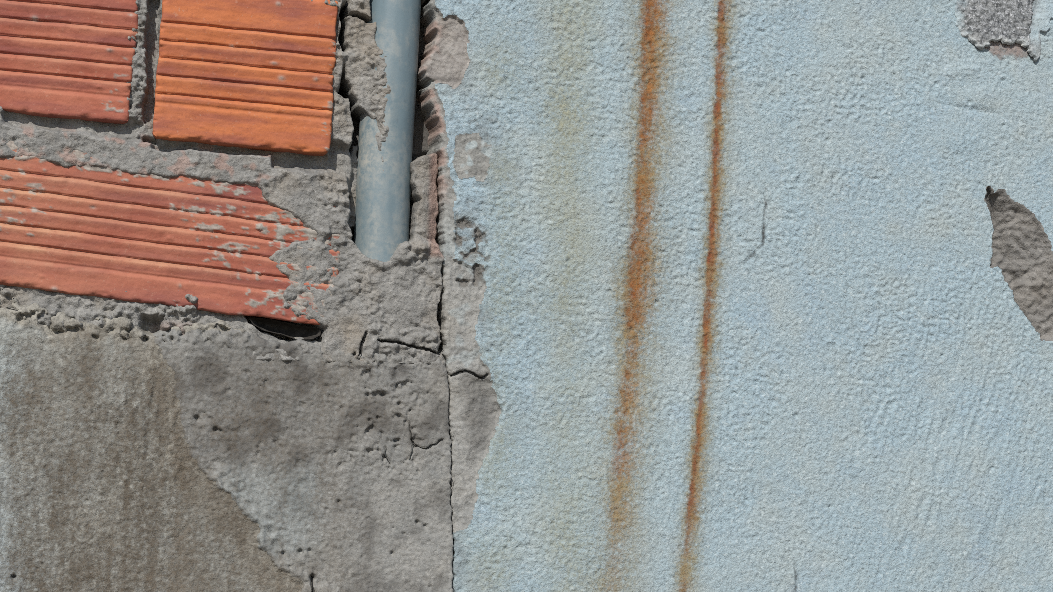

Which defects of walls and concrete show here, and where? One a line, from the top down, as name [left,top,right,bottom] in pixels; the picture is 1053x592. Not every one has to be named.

peeling [954,0,1053,62]
crack [354,331,488,378]
flaking render [416,0,501,533]
rust [610,0,667,443]
rust [680,0,730,592]
spalling [984,186,1053,341]
water stain [0,334,301,592]
crack [385,421,454,460]
rust [608,462,631,542]